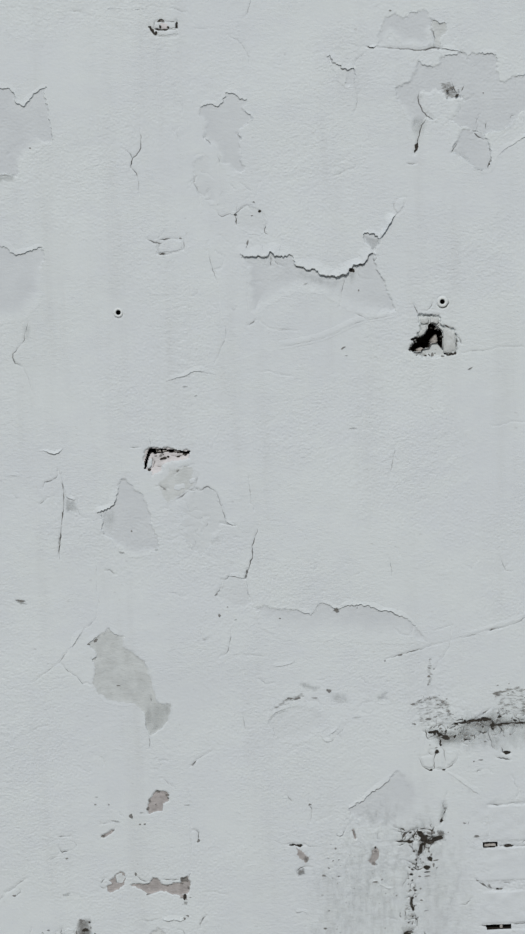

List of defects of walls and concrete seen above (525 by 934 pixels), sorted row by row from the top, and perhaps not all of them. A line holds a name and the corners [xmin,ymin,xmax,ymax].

peeling [0,82,56,177]
peeling [199,88,254,177]
peeling [326,53,359,88]
peeling [395,18,525,175]
peeling [0,240,45,326]
peeling [233,229,395,320]
spalling [409,308,457,358]
spalling [144,448,190,469]
peeling [92,478,159,559]
peeling [253,600,426,645]
flaking render [86,627,172,736]
spalling [102,872,191,900]